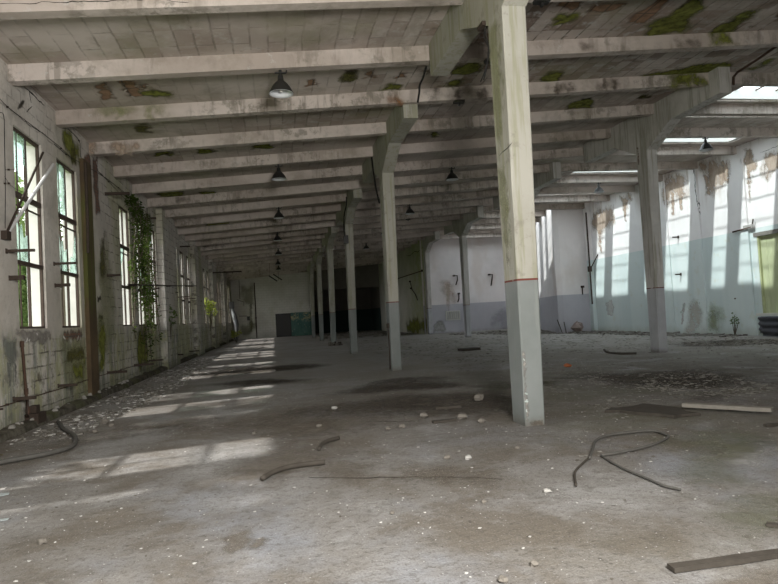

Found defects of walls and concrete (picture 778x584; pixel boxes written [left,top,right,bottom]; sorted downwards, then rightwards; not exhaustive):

crack [0,0,116,8]
spalling [95,80,149,100]
damp [4,338,17,386]